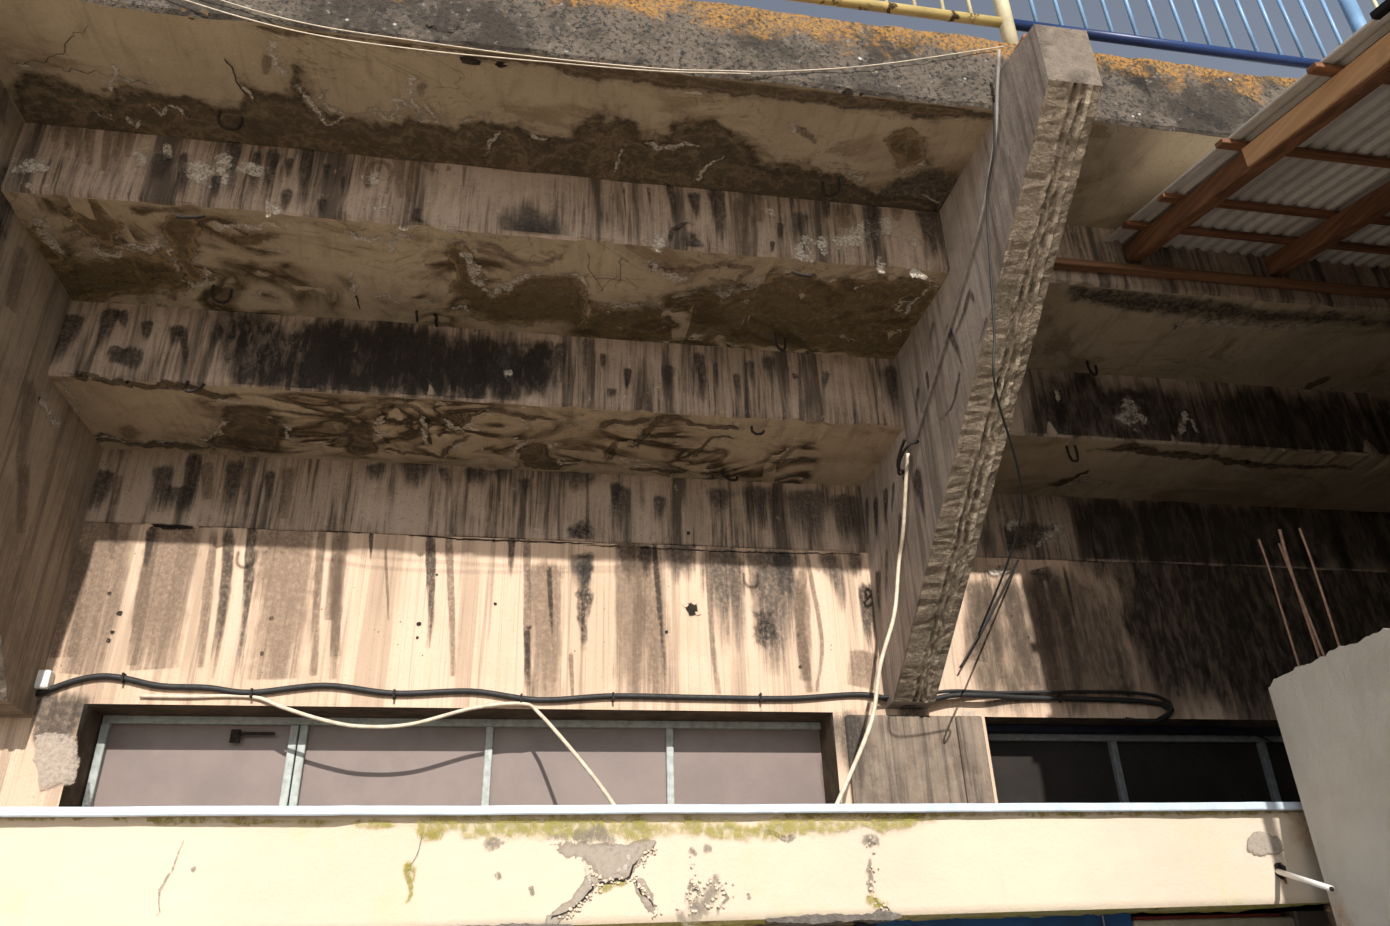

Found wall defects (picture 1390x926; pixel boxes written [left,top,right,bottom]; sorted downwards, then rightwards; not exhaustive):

spalling [456,55,509,68]
spalling [398,206,424,231]
water stain [1073,286,1390,330]
water stain [0,25,1009,696]
water stain [1029,372,1390,475]
water stain [968,470,1390,725]
crack [156,847,196,916]
flaking render [466,838,751,926]